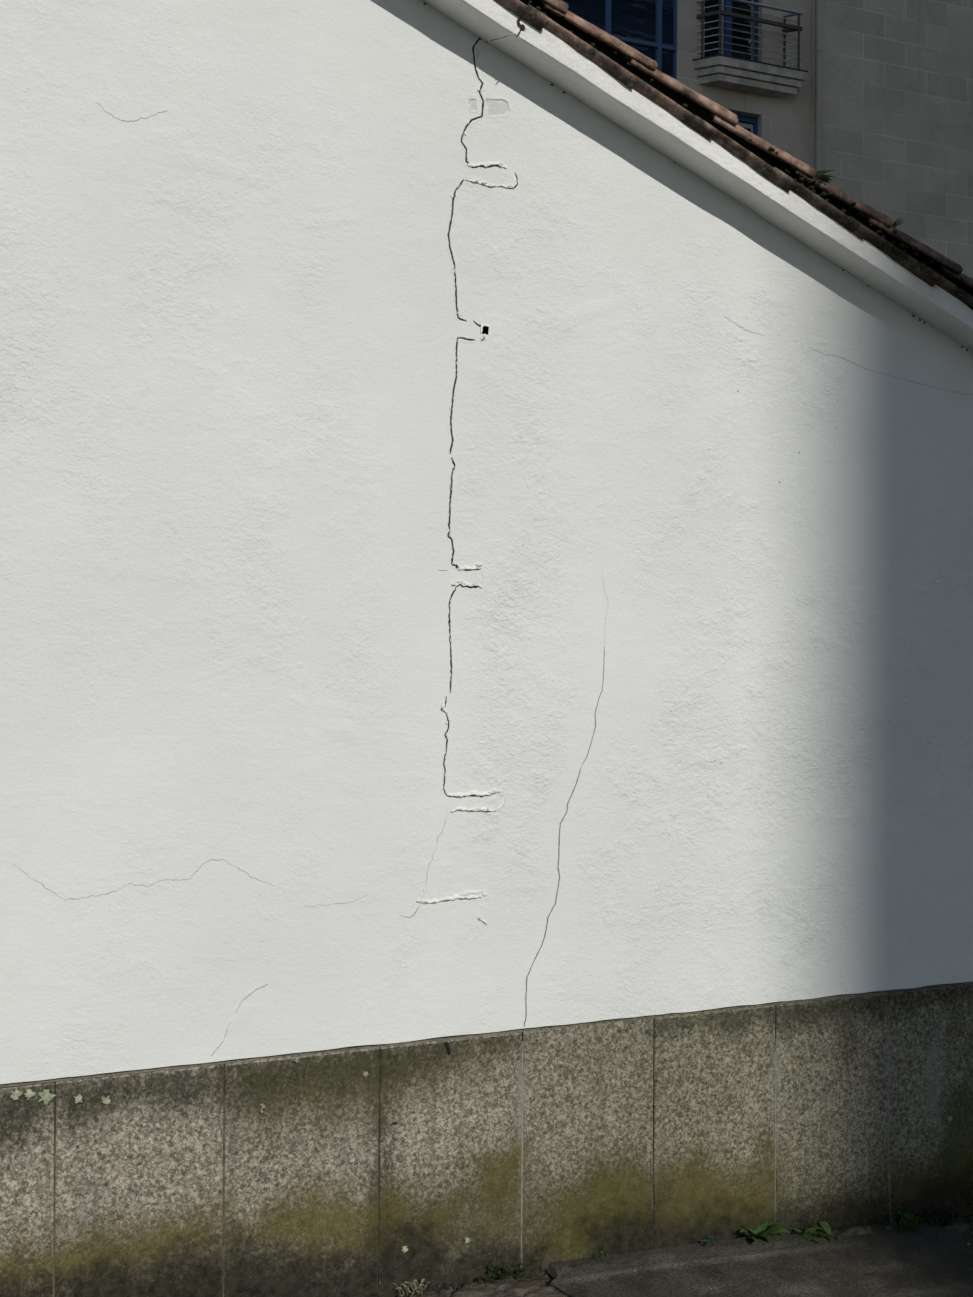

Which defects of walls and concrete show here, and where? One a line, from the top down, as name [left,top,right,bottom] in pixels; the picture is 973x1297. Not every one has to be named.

crack [400,17,527,918]
crack [524,574,608,1027]
crack [17,859,270,901]
crack [210,983,268,1056]
water stain [0,1172,548,1297]
water stain [587,1177,973,1258]